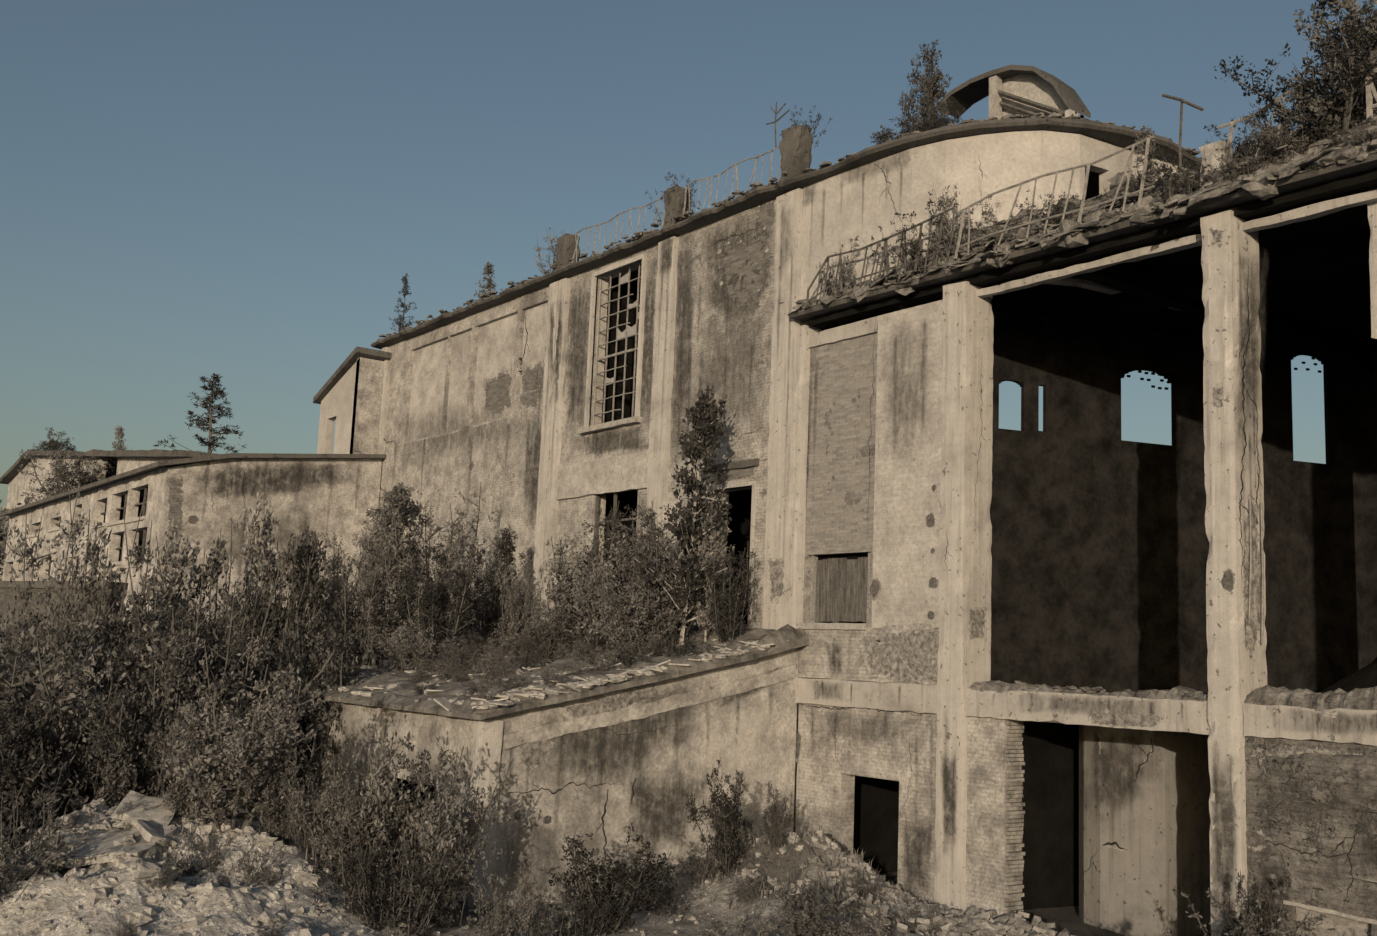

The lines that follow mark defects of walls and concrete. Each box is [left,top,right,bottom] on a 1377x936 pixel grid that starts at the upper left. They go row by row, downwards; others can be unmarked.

water stain [709,221,768,311]
spalling [483,361,544,415]
spalling [860,622,939,685]
water stain [562,695,677,774]
crack [509,778,637,883]
water stain [631,785,703,852]
crack [1265,802,1377,907]